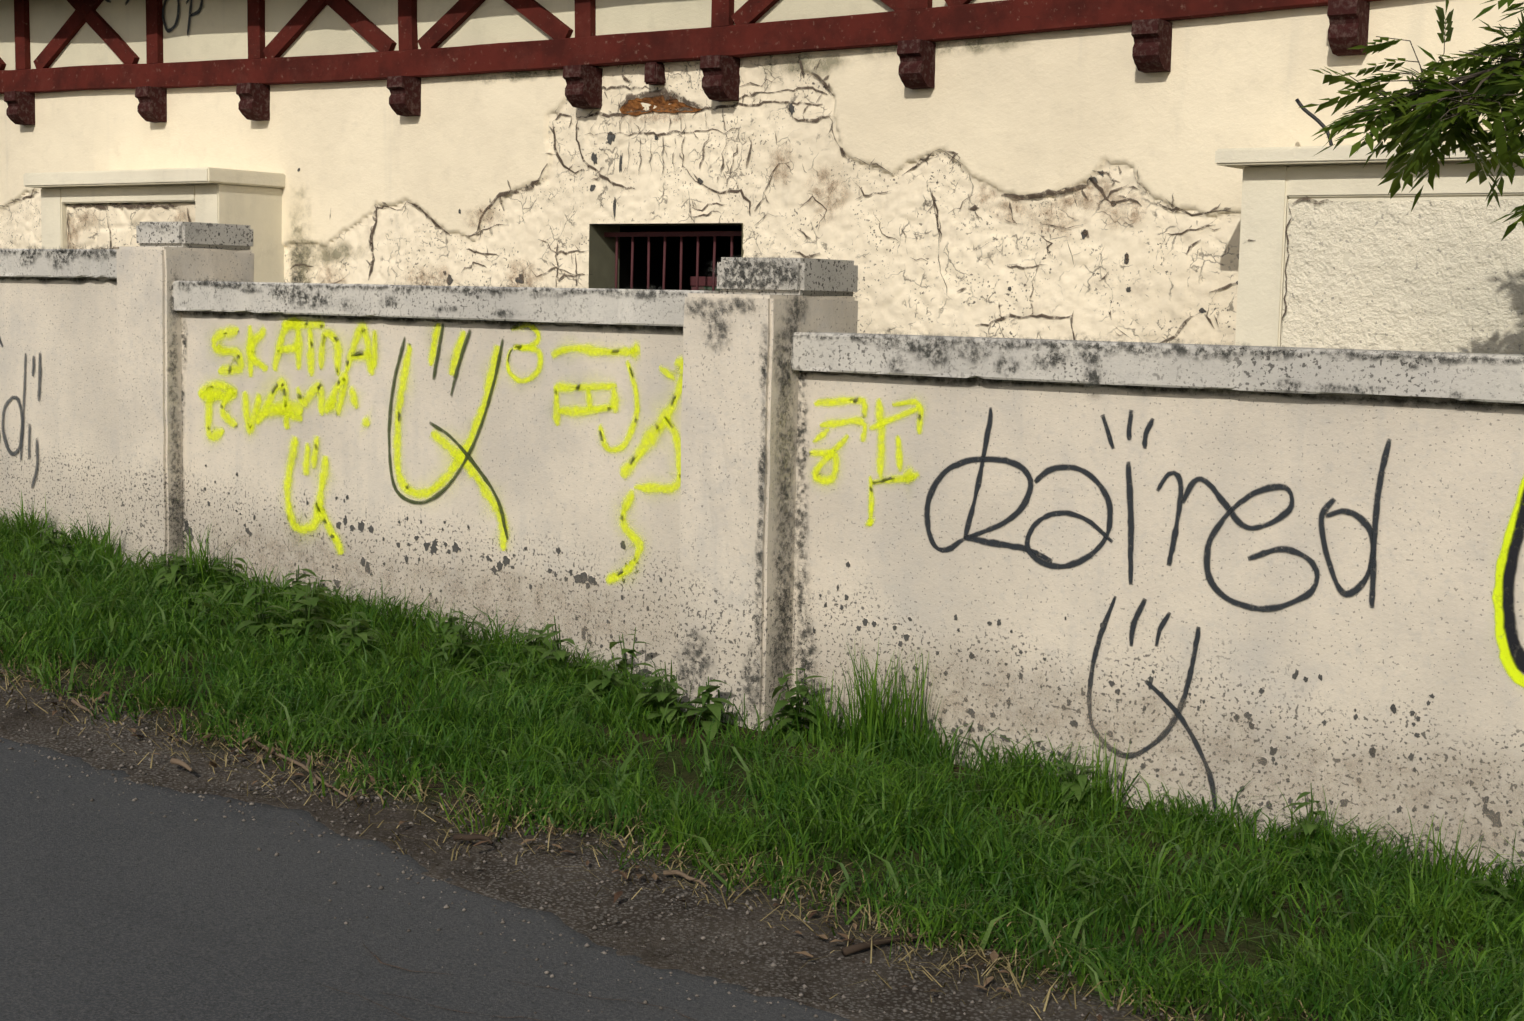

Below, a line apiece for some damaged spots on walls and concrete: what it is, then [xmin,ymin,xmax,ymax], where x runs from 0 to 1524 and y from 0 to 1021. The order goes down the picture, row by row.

flaking render [0,188,42,249]
flaking render [284,53,1241,345]
crack [291,58,1333,343]
water stain [168,229,1524,713]